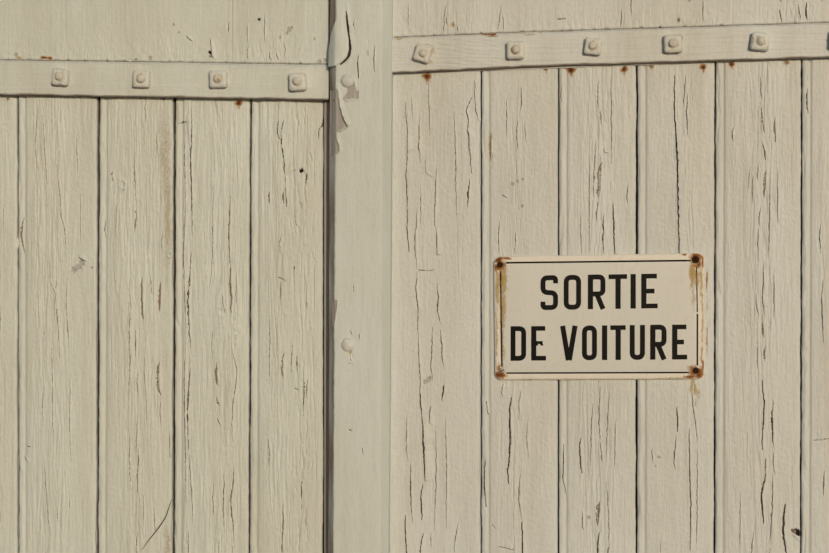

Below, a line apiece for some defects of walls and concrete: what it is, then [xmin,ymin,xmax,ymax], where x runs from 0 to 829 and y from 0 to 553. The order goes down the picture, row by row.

peeling [317,0,361,155]
peeling [406,109,414,252]
peeling [466,80,481,174]
peeling [673,76,684,253]
crack [35,109,83,462]
crack [128,107,239,553]
corrosion [494,257,511,355]
corrosion [673,253,708,379]
peeling [419,375,435,520]